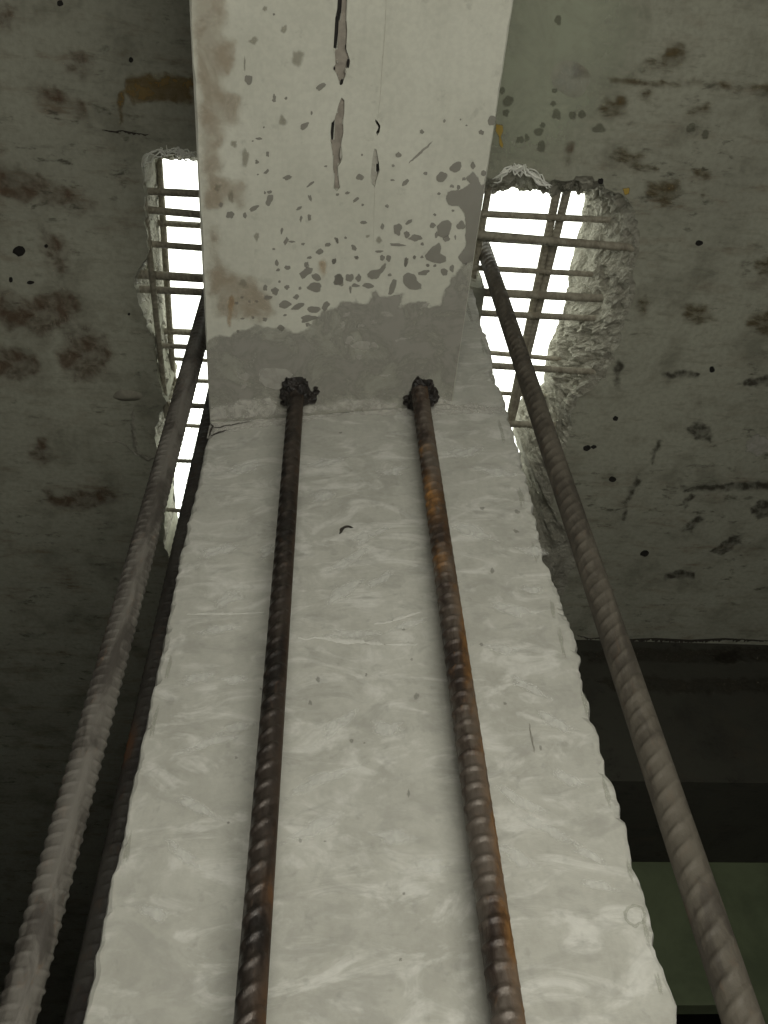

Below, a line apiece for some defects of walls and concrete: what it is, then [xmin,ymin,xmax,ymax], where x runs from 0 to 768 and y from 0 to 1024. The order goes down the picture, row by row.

rust [117,74,194,121]
spalling [331,98,344,188]
spalling [333,0,350,85]
spalling [371,149,379,184]
spalling [0,150,210,1024]
spalling [233,368,304,1024]
spalling [411,385,526,1024]
spalling [471,171,766,1024]